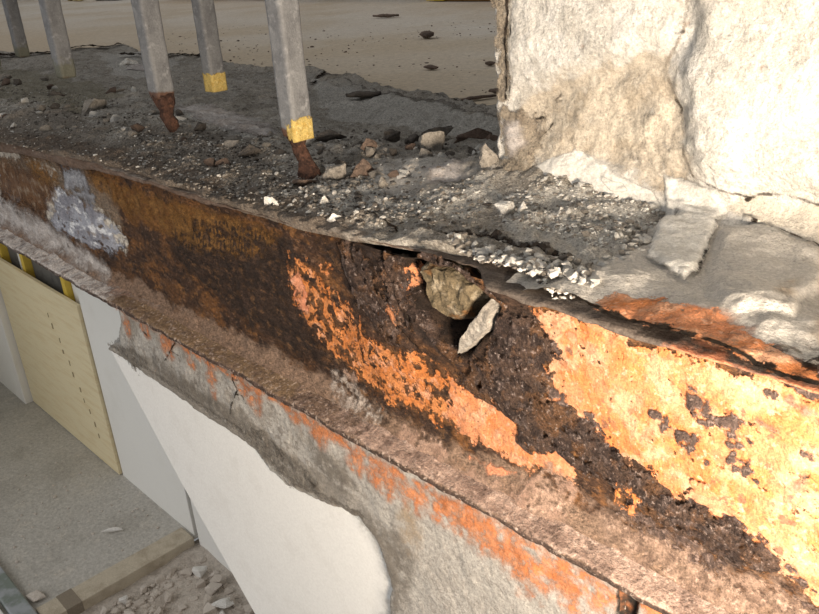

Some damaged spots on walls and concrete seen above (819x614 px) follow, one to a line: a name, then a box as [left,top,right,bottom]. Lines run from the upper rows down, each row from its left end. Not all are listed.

spalling [176,104,272,136]
spalling [310,0,690,197]
peeling [0,152,128,255]
water stain [0,199,131,297]
crack [683,154,819,246]
rust [89,171,453,450]
rust [181,345,618,614]
rust [485,332,546,417]
rust [648,386,760,485]
rust [764,385,819,416]
rust [586,452,819,614]